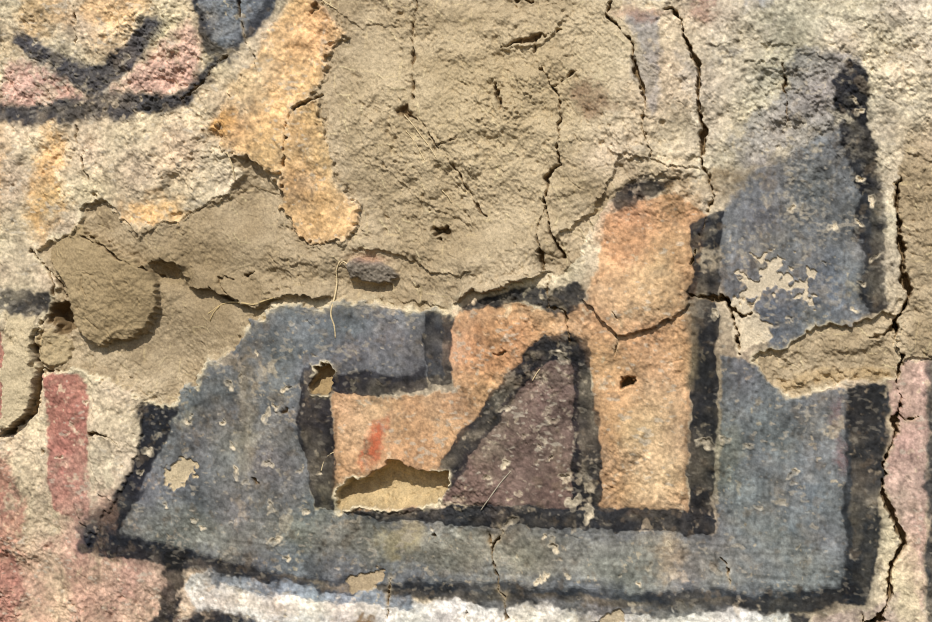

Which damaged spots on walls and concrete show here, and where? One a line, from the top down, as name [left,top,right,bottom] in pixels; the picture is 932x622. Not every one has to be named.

spalling [0,0,713,430]
crack [410,0,488,217]
crack [501,28,576,342]
crack [605,0,652,157]
crack [664,7,716,266]
crack [0,322,60,437]
spalling [164,456,199,491]
spalling [331,459,450,517]
spalling [731,248,900,401]
crack [862,175,919,622]
spalling [346,567,385,594]
spalling [599,609,625,622]